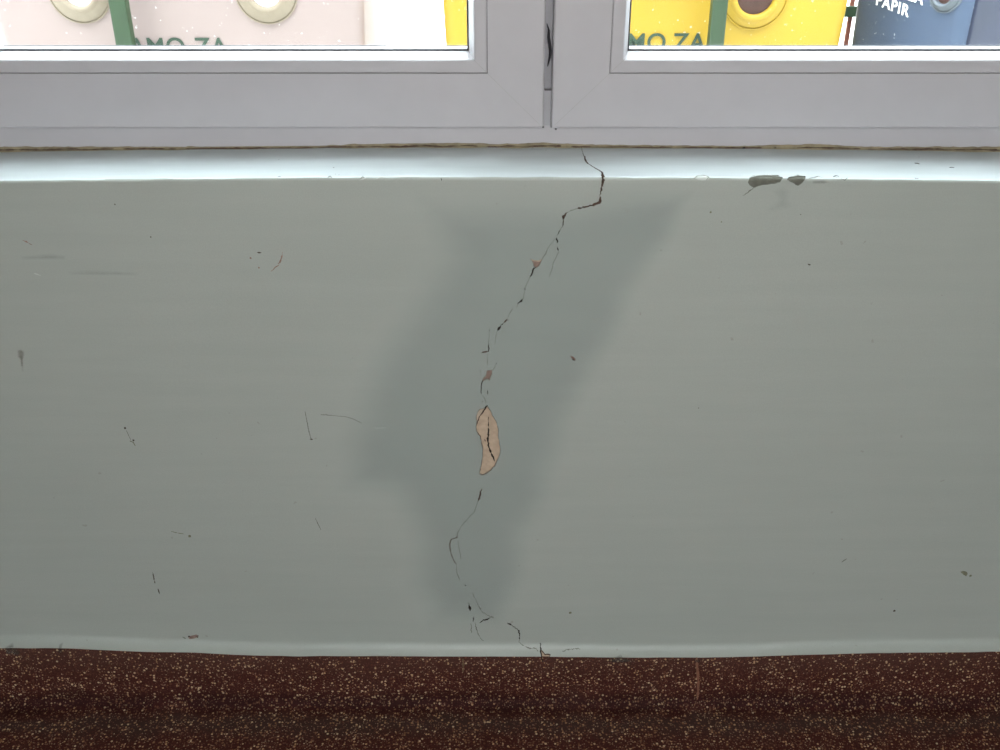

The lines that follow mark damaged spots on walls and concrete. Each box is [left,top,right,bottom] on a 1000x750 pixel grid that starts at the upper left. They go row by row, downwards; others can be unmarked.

spalling [746,175,847,194]
crack [480,154,605,413]
spalling [476,406,501,476]
crack [449,489,579,661]